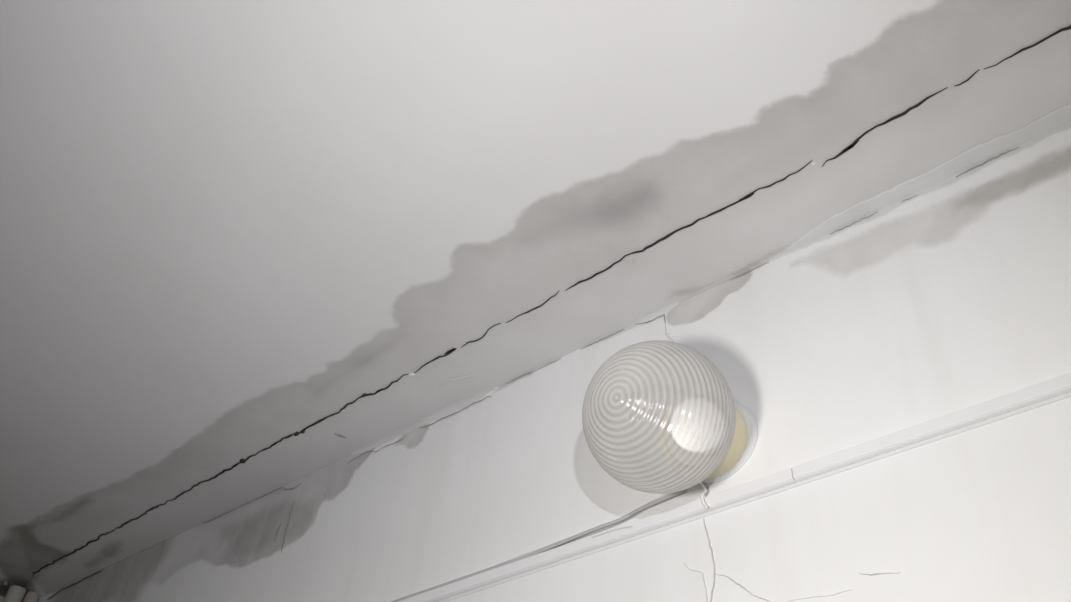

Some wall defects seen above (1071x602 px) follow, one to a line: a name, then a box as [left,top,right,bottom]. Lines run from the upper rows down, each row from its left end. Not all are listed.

crack [565,25,1071,291]
crack [31,291,559,579]
crack [347,314,673,464]
crack [47,570,103,600]
crack [684,518,900,602]